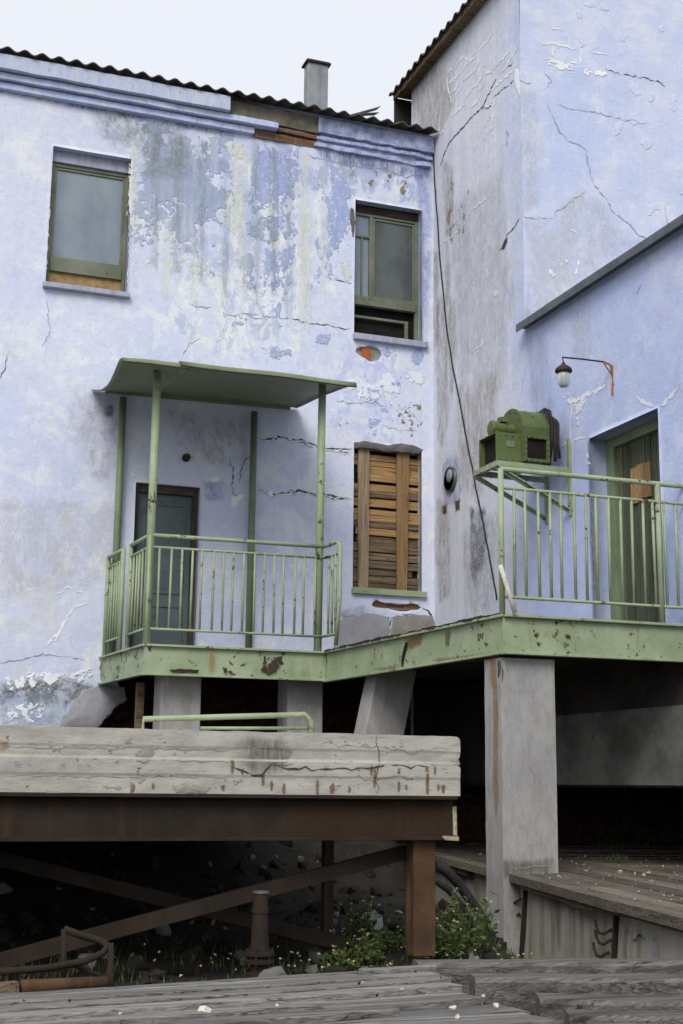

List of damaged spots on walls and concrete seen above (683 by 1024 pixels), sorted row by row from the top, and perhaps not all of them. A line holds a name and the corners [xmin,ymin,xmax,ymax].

flaking render [229,94,272,106]
crack [310,28,664,251]
peeling [127,118,356,327]
crack [182,304,351,355]
peeling [262,346,292,360]
peeling [345,346,425,436]
crack [230,435,353,501]
peeling [5,662,102,691]
corrosion [259,652,285,675]
peeling [7,703,44,723]
corrosion [437,655,498,806]
crack [4,738,430,793]